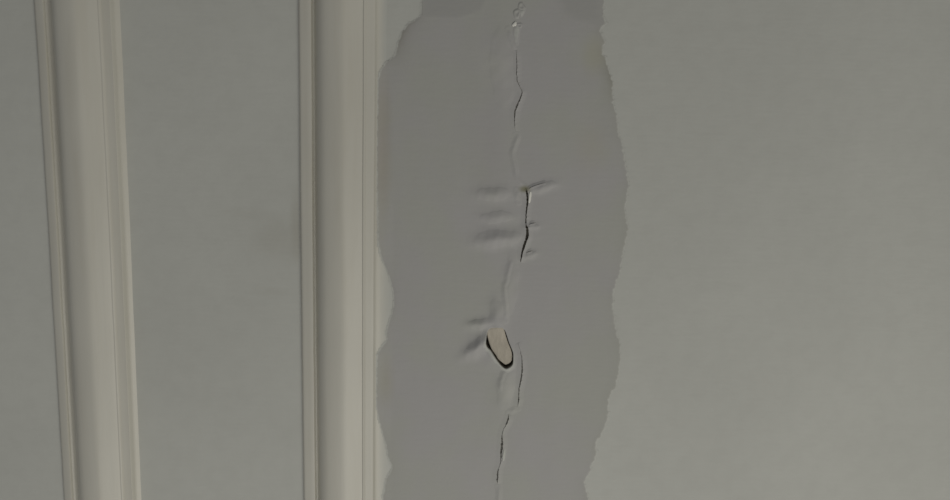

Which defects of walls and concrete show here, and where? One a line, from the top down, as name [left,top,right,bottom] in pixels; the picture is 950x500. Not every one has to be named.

flaking render [486,328,513,368]
crack [492,25,546,500]